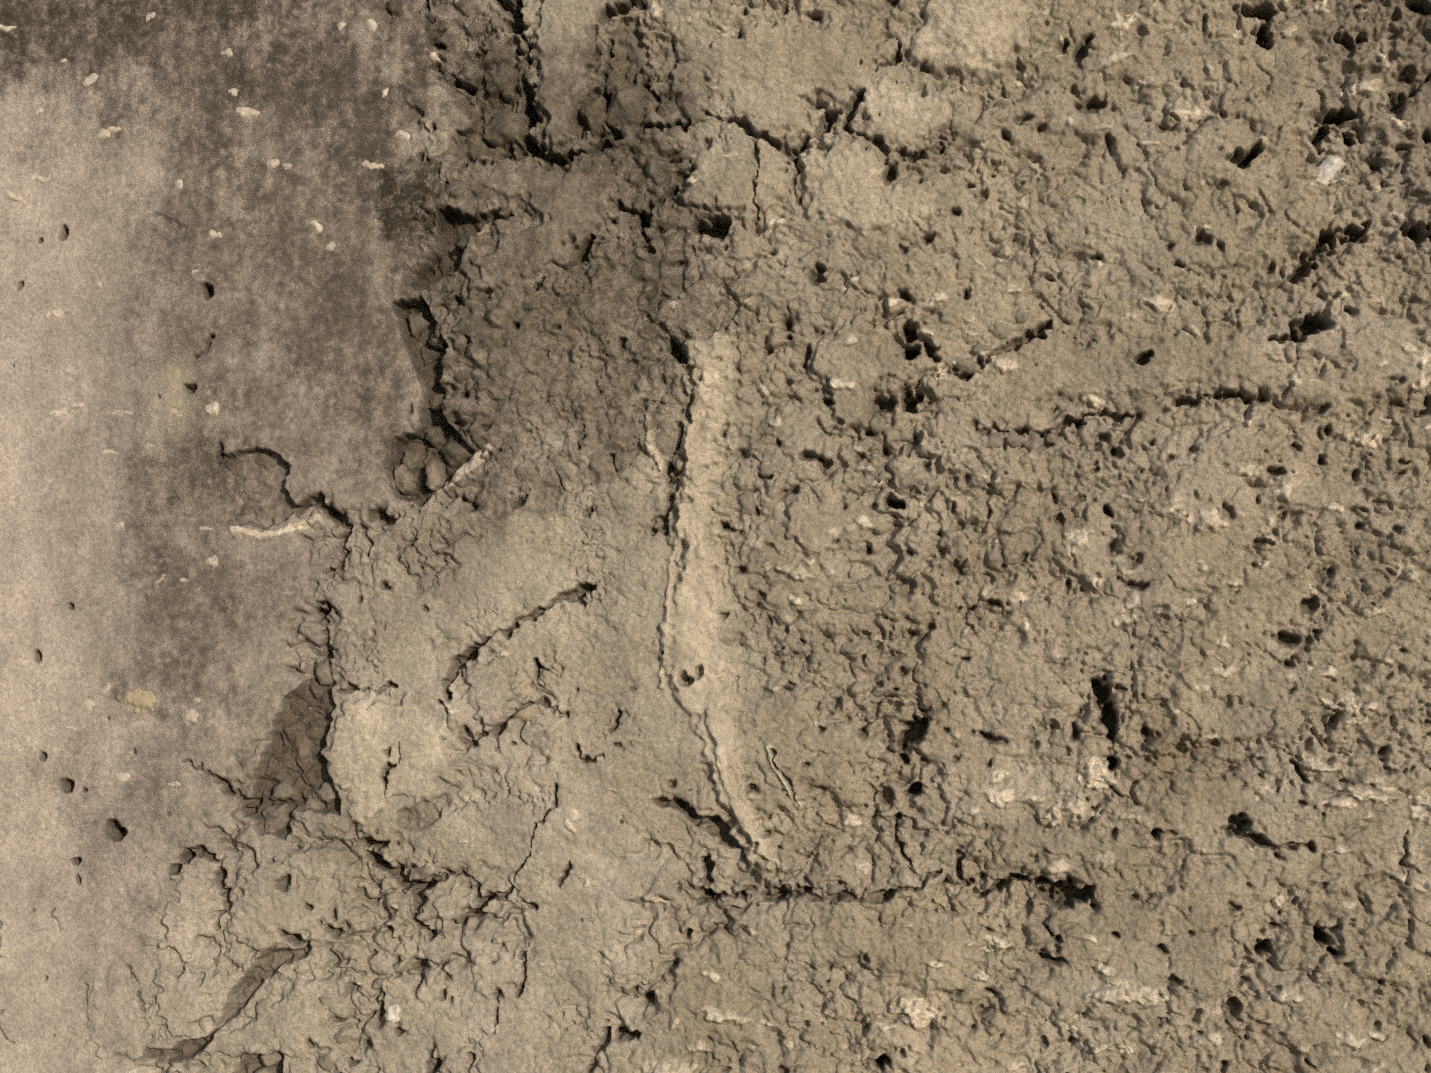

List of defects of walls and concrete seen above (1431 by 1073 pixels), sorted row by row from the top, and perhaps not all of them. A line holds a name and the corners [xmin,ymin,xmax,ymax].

spalling [439,38,532,175]
crack [481,0,944,255]
leakage [0,0,446,540]
spalling [387,189,529,509]
crack [535,234,596,291]
crack [189,845,233,931]
leakage [154,522,293,679]
crack [191,761,263,817]
spalling [109,659,406,1073]
spalling [225,448,324,539]
crack [283,338,1096,1073]
spalling [642,0,1431,1073]